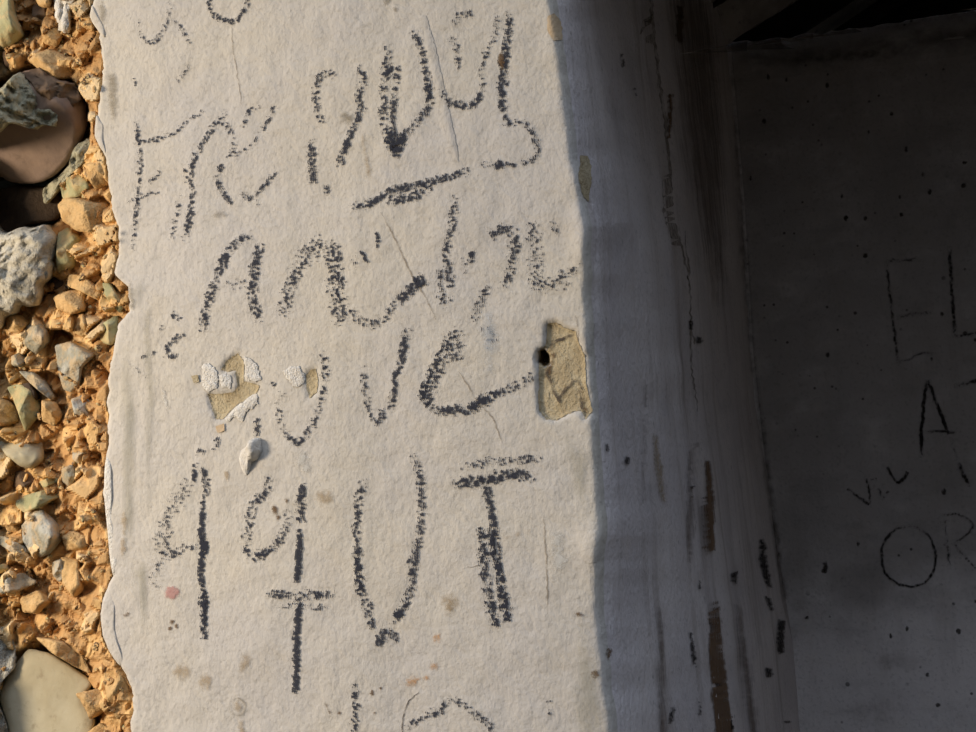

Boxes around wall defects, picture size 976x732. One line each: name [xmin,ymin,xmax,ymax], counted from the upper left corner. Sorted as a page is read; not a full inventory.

flaking render [0,0,134,732]
peeling [191,354,261,433]
peeling [538,322,593,420]
corrosion [702,461,716,551]
corrosion [708,601,733,732]